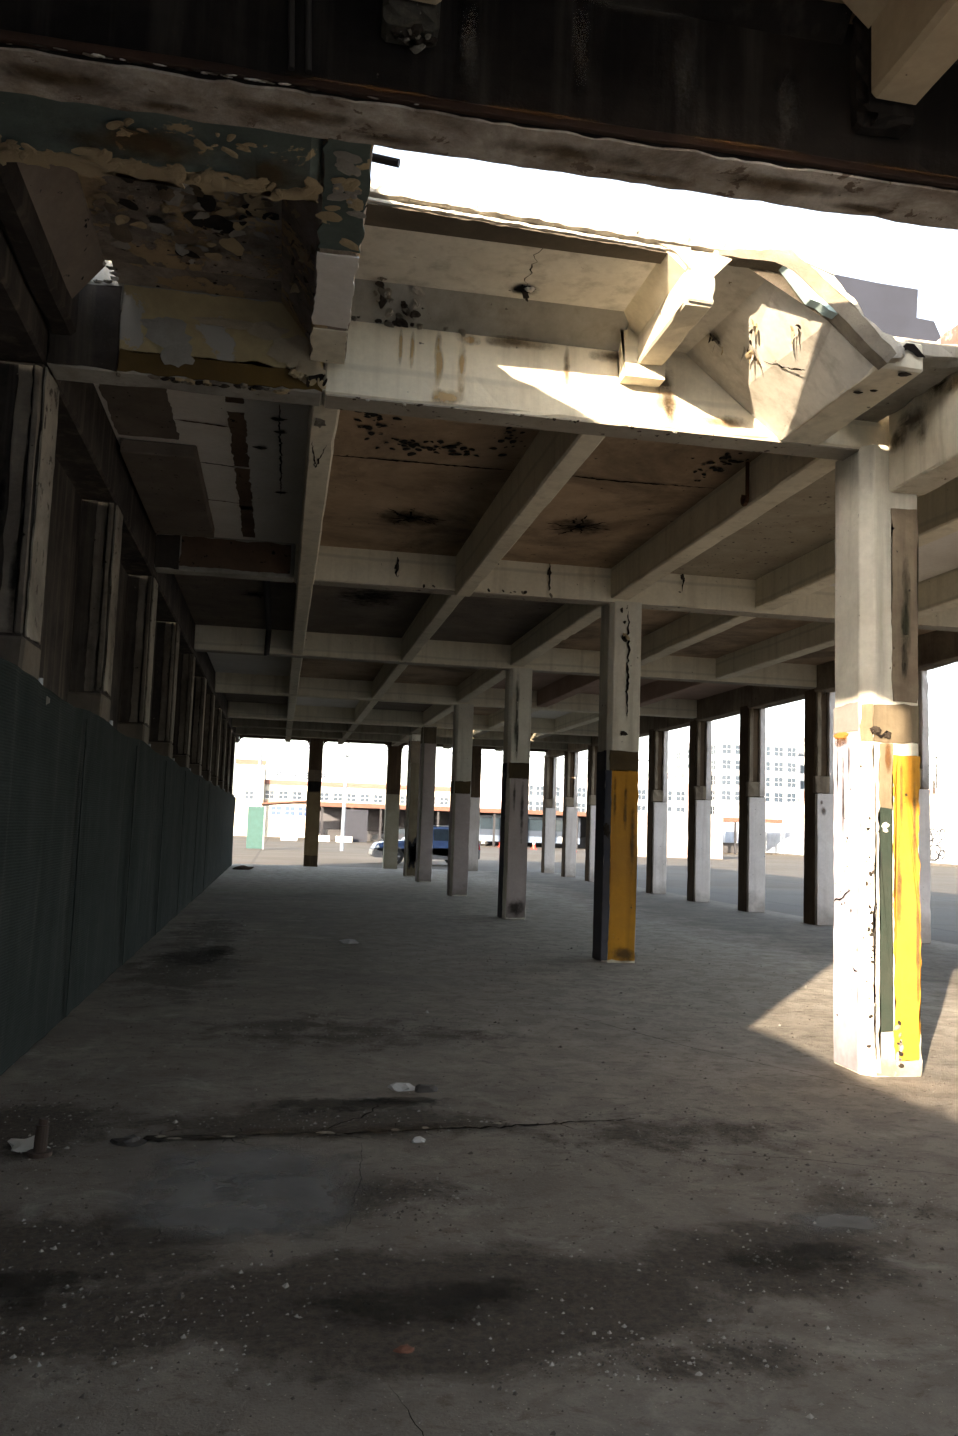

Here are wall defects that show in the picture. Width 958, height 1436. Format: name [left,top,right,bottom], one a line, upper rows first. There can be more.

spalling [6,43,318,91]
peeling [0,118,366,264]
spalling [373,277,425,330]
peeling [140,316,327,395]
crack [143,1097,958,1229]